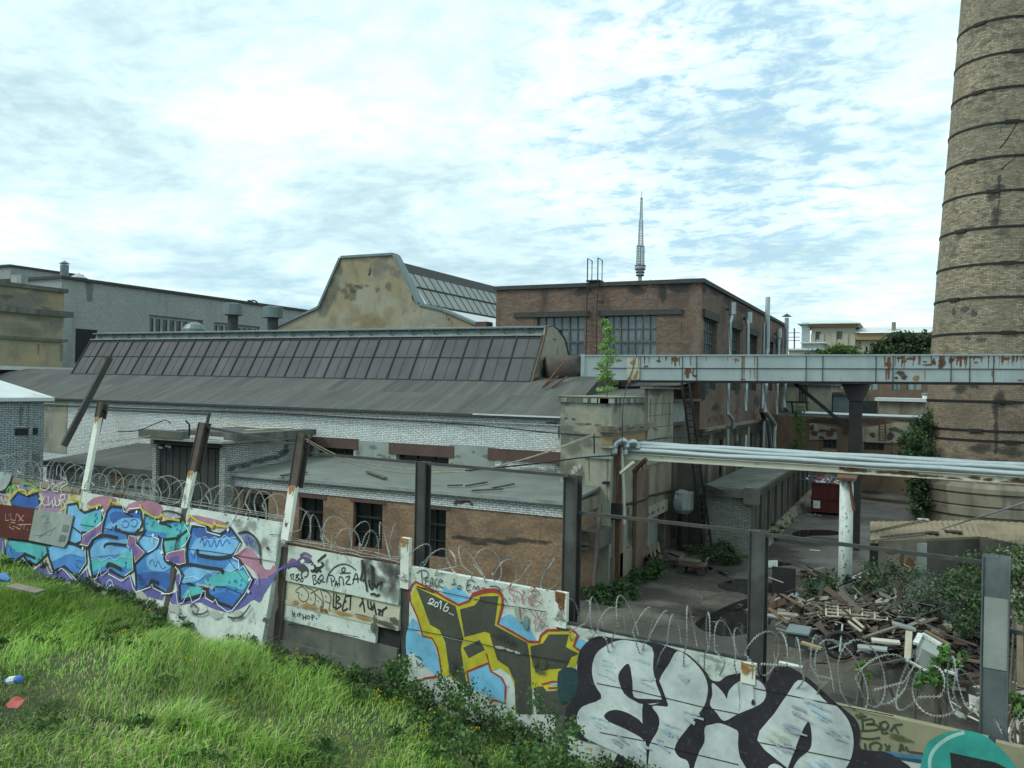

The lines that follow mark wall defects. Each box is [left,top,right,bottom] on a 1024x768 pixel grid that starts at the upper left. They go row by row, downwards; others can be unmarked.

rust [627,356,696,383]
rust [884,356,1024,381]